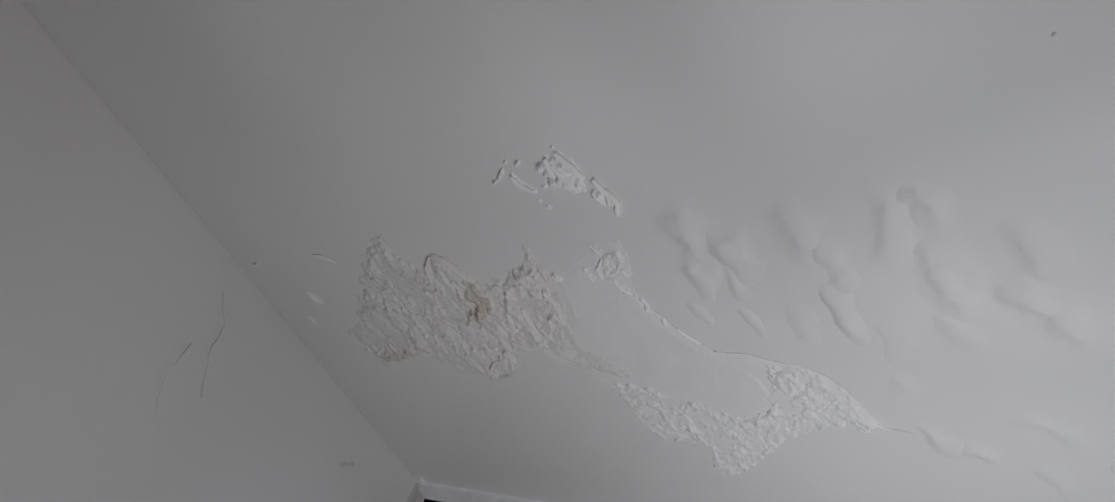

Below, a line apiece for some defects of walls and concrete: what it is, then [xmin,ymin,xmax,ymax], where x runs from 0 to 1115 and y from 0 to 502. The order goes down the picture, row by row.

peeling [492,145,622,217]